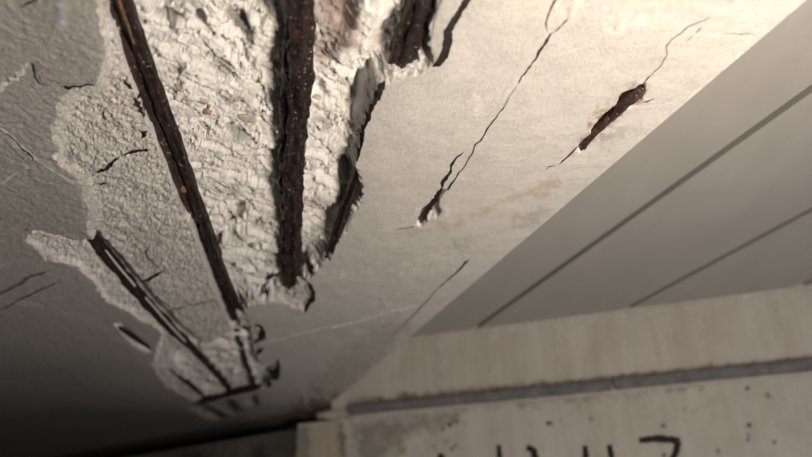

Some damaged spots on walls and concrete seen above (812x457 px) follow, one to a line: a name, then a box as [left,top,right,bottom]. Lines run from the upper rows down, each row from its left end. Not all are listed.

crack [31,63,97,90]
rust [117,0,135,45]
crack [433,0,471,67]
crack [441,0,570,191]
rust [577,83,647,153]
crack [642,17,711,103]
crack [0,128,151,186]
spalling [24,0,464,420]